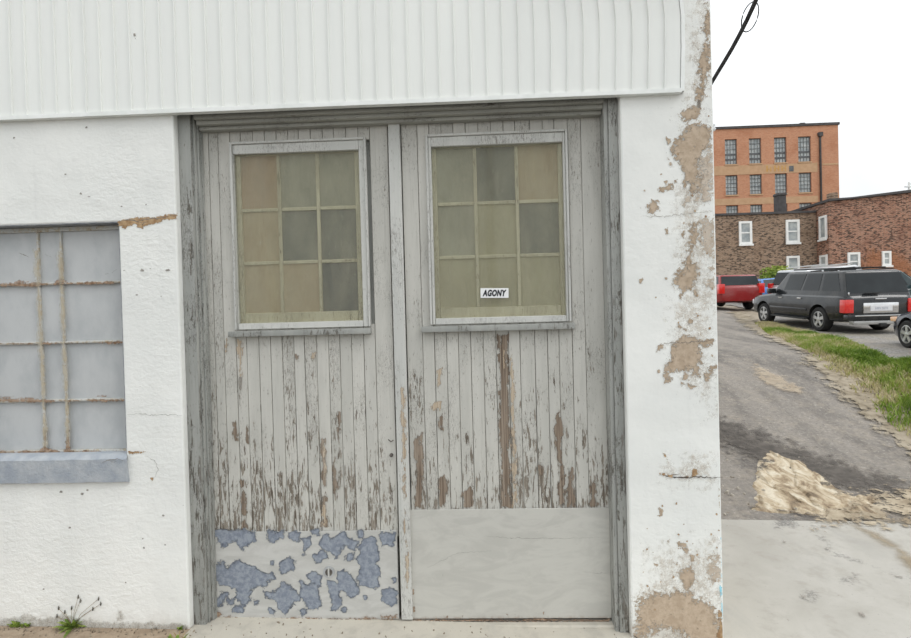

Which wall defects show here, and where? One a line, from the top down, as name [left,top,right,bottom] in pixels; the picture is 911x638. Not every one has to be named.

spalling [643,2,715,304]
spalling [118,214,178,229]
corrosion [0,251,124,453]
peeling [657,313,717,389]
crack [664,472,723,480]
peeling [215,528,399,617]
spalling [631,534,721,638]